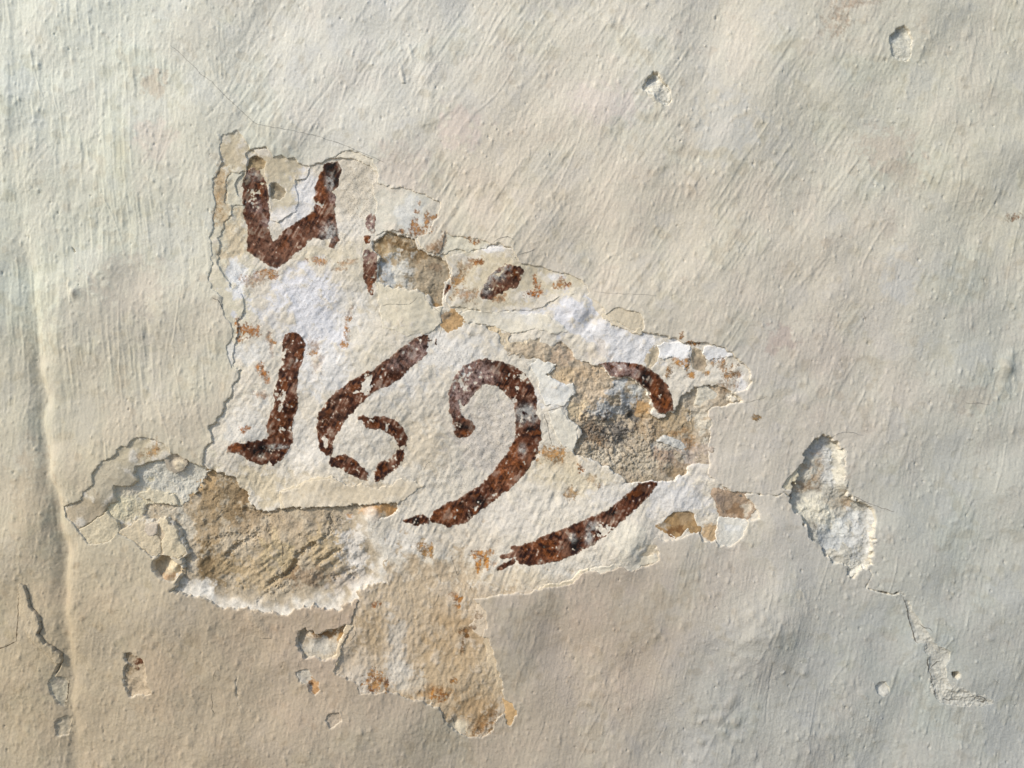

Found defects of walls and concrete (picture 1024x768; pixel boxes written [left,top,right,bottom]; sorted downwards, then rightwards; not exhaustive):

peeling [643,74,671,105]
peeling [889,27,911,61]
peeling [65,130,759,738]
flaking render [783,435,874,578]
crack [0,583,69,704]
crack [879,591,998,707]